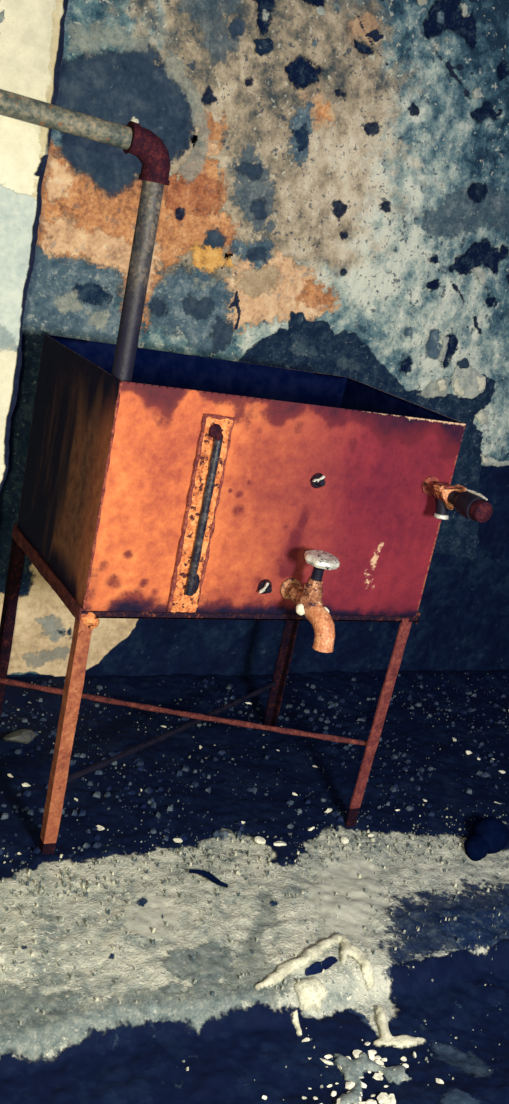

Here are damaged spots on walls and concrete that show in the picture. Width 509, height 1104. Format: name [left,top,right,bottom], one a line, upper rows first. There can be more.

rust [36,140,143,312]
damp [40,127,142,199]
damp [46,0,210,181]
damp [202,143,277,270]
rust [140,110,341,334]
damp [287,93,316,168]
damp [422,182,509,239]
damp [144,266,235,353]
damp [238,311,509,674]
damp [85,619,285,676]
damp [0,893,287,1062]
damp [303,853,509,979]